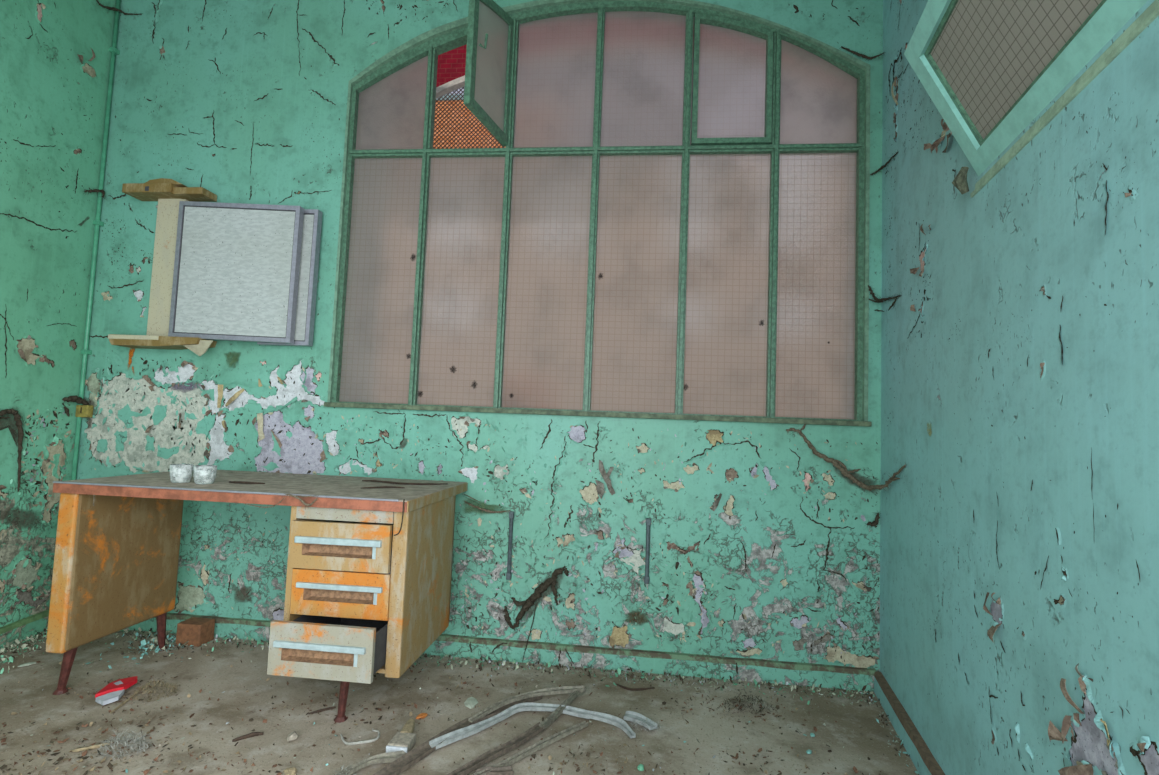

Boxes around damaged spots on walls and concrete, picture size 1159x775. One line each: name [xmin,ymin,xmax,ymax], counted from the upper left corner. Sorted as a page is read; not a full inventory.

crack [152,0,163,44]
crack [168,0,403,200]
peeling [885,0,953,199]
crack [13,139,79,193]
crack [0,213,76,232]
crack [108,193,154,233]
crack [0,289,28,377]
peeling [0,353,880,674]
peeling [982,583,1031,652]
peeling [409,652,919,775]
peeling [1038,663,1159,775]